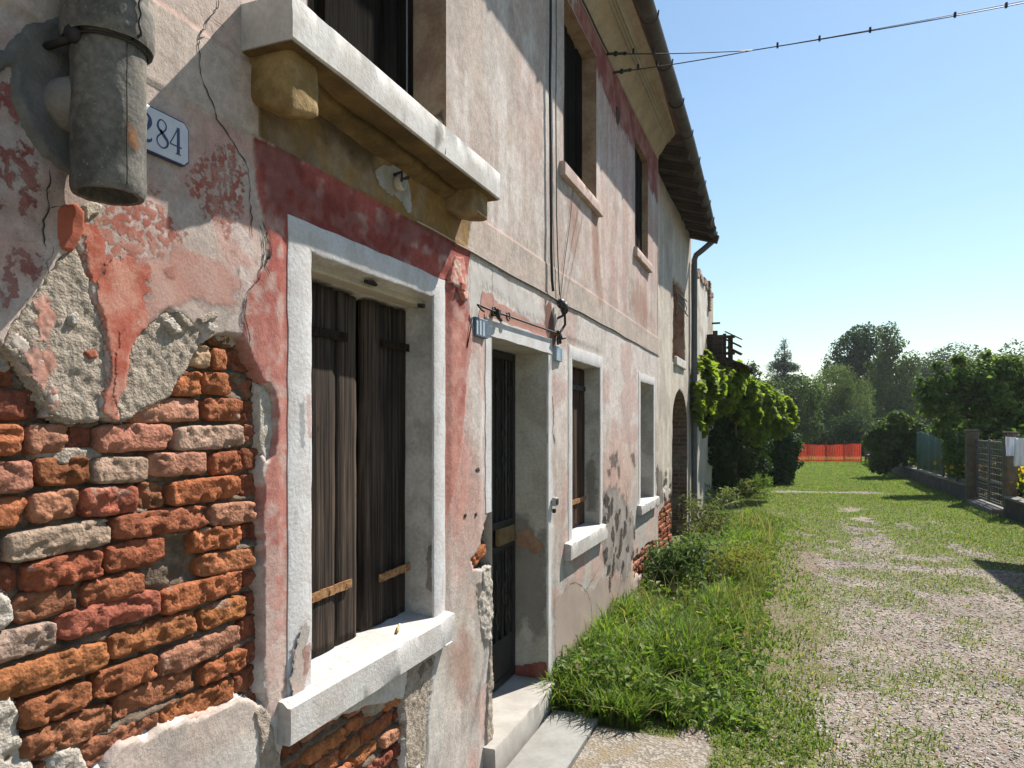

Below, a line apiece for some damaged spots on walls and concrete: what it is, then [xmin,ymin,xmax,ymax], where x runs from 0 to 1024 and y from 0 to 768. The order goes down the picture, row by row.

peeling [0,82,19,124]
peeling [0,140,42,215]
crack [42,171,58,280]
peeling [185,143,248,239]
crack [198,0,272,350]
peeling [375,164,412,214]
flaking render [0,186,435,768]
flaking render [602,449,672,591]
spalling [478,564,494,745]